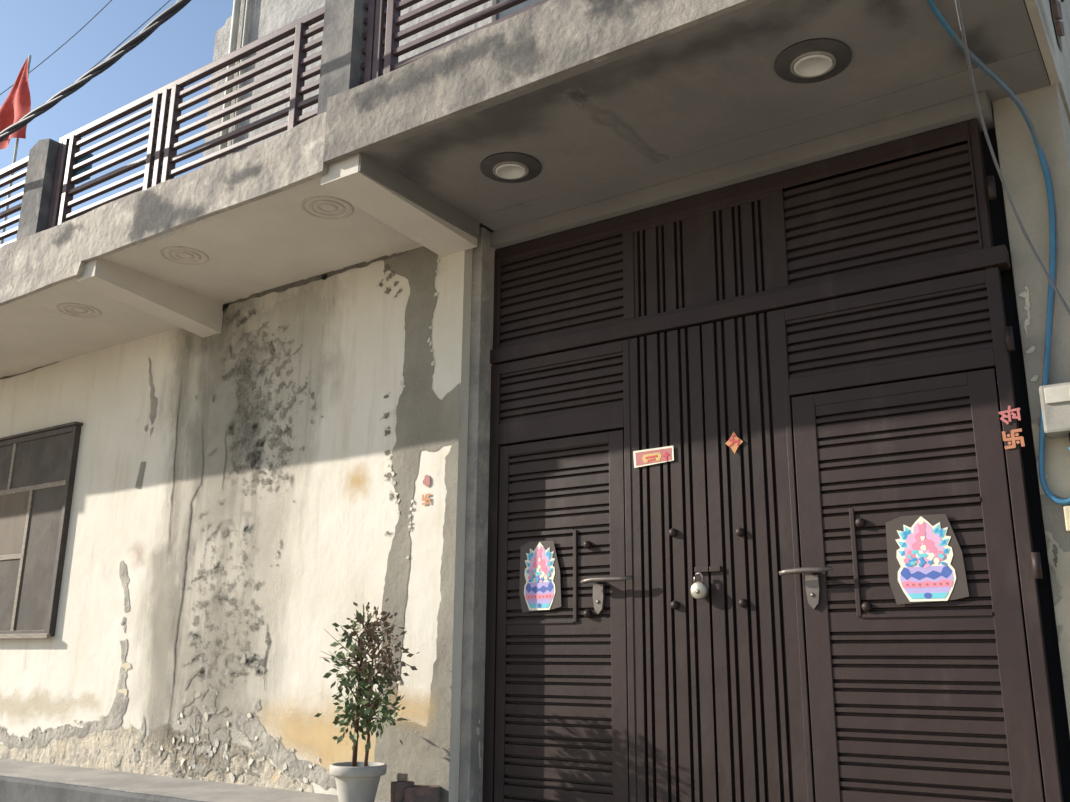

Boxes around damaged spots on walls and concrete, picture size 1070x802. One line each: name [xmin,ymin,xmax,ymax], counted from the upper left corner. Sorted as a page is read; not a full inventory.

water stain [356,34,535,109]
peeling [145,358,158,436]
peeling [209,309,324,496]
water stain [0,293,322,793]
peeling [374,246,460,802]
spalling [0,561,131,748]
peeling [157,512,337,791]